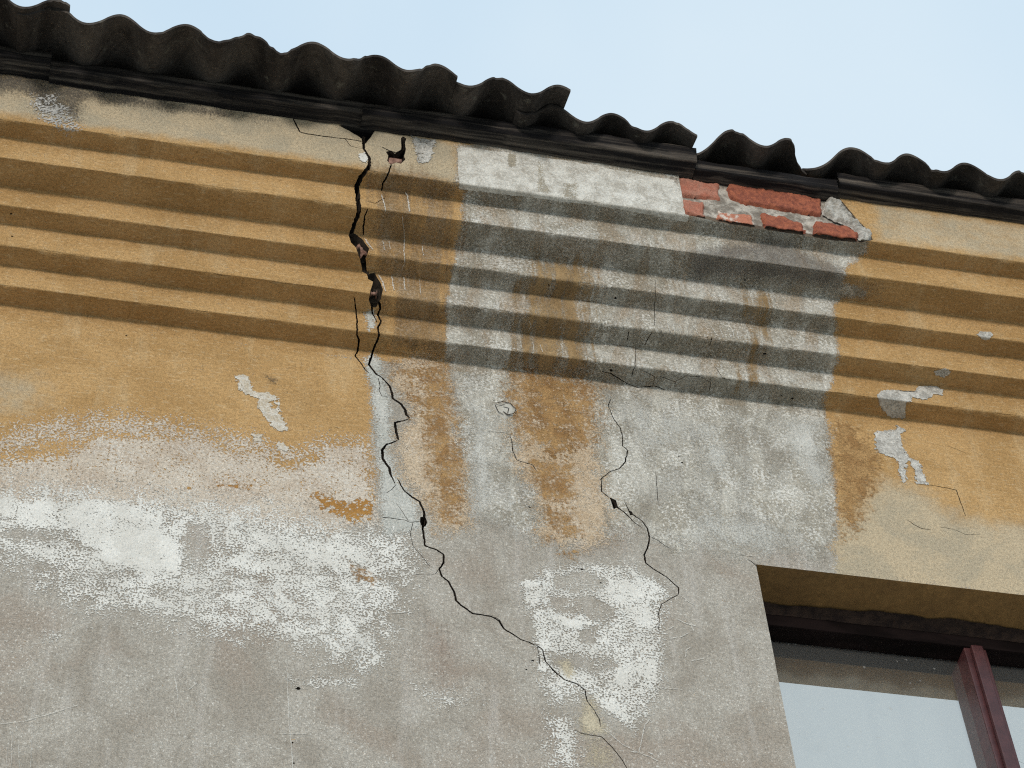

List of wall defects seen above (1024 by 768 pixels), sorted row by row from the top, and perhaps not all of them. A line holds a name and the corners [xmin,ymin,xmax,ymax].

peeling [412,136,436,164]
peeling [457,147,873,243]
peeling [0,374,384,541]
water stain [0,351,437,693]
crack [294,120,683,768]
water stain [363,144,868,768]
crack [600,290,729,661]
peeling [874,368,951,485]